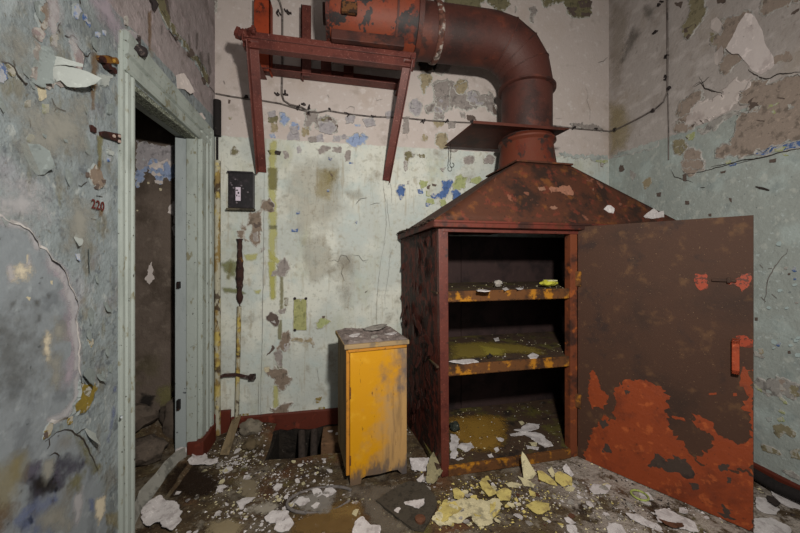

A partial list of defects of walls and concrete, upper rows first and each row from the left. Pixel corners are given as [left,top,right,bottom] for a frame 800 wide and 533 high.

peeling [24,0,113,114]
peeling [672,0,800,181]
crack [748,69,794,80]
peeling [267,109,376,164]
peeling [402,62,498,208]
flaking render [85,163,106,191]
peeling [395,181,409,201]
crack [671,148,800,188]
crack [760,249,788,302]
peeling [264,297,332,392]
flaking render [0,214,108,533]
crack [45,428,98,470]